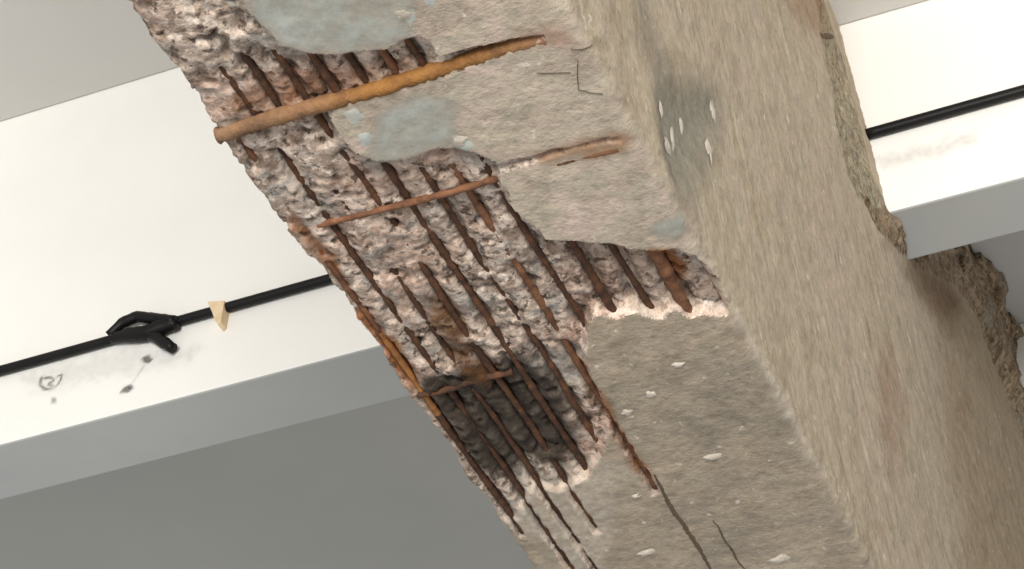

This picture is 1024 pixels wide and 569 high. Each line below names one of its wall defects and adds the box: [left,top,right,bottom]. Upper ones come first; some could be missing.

spalling [129,0,546,128]
rust [655,250,684,276]
spalling [816,0,1024,439]
rust [356,311,415,379]
spalling [226,96,729,569]
damp [423,353,575,473]
crack [654,475,745,569]